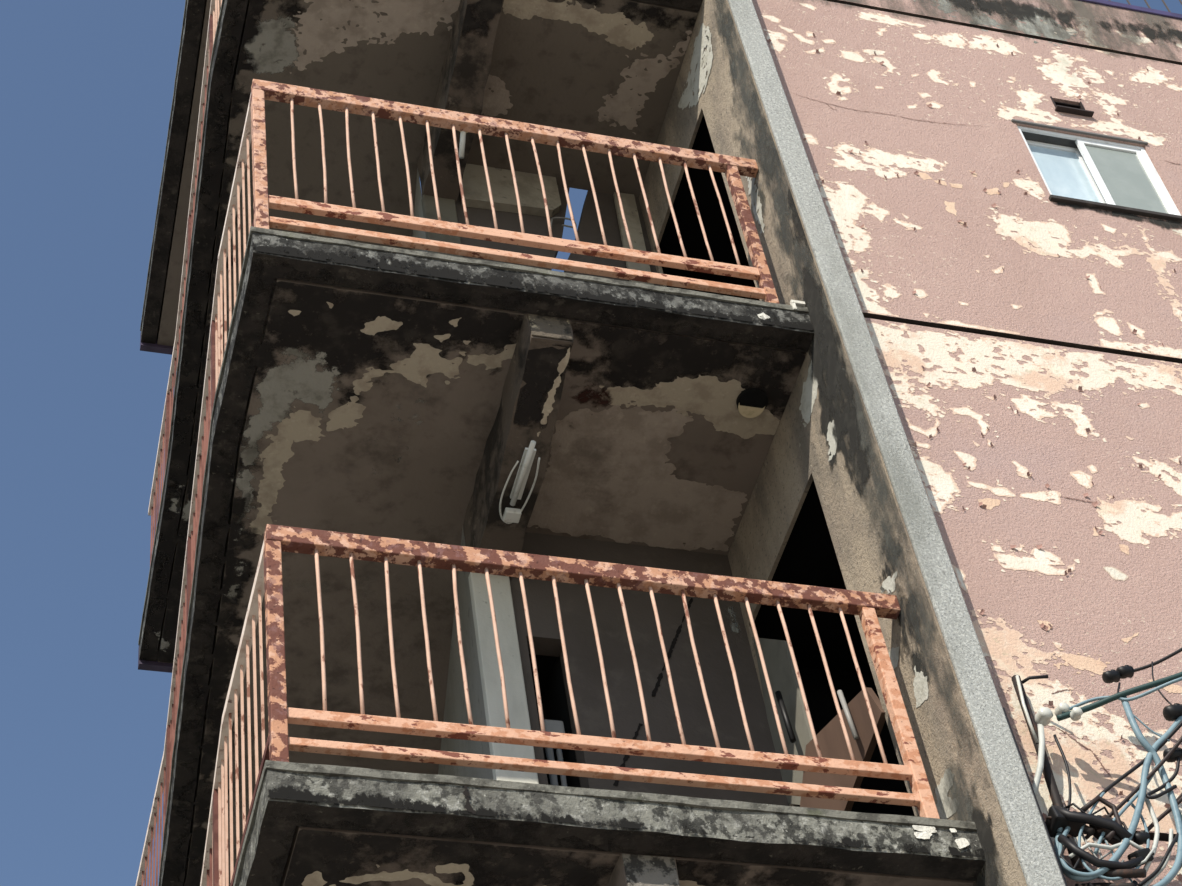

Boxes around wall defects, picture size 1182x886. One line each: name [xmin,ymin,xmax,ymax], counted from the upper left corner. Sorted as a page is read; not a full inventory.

peeling [502,0,713,135]
peeling [761,0,1182,149]
damp [918,0,1182,60]
damp [140,0,305,663]
peeling [231,316,516,541]
damp [245,0,971,746]
peeling [527,348,780,551]
peeling [802,133,1182,555]
damp [177,416,260,886]
damp [267,786,855,886]
damp [793,768,1002,886]
peeling [952,564,1182,881]